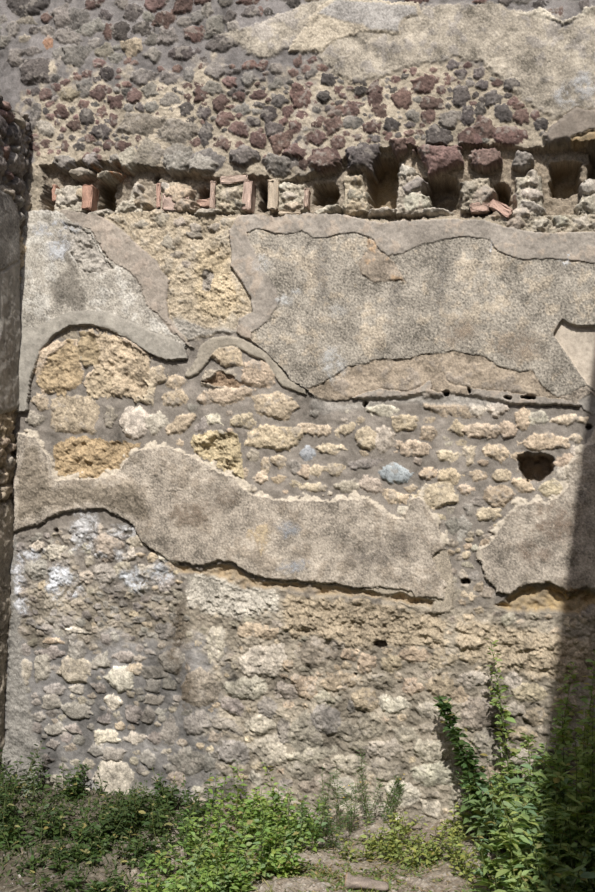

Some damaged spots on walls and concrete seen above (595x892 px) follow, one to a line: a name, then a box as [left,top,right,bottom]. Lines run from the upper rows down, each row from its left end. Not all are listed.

spalling [27,48,547,178]
crack [355,233,407,288]
spalling [1,211,595,826]